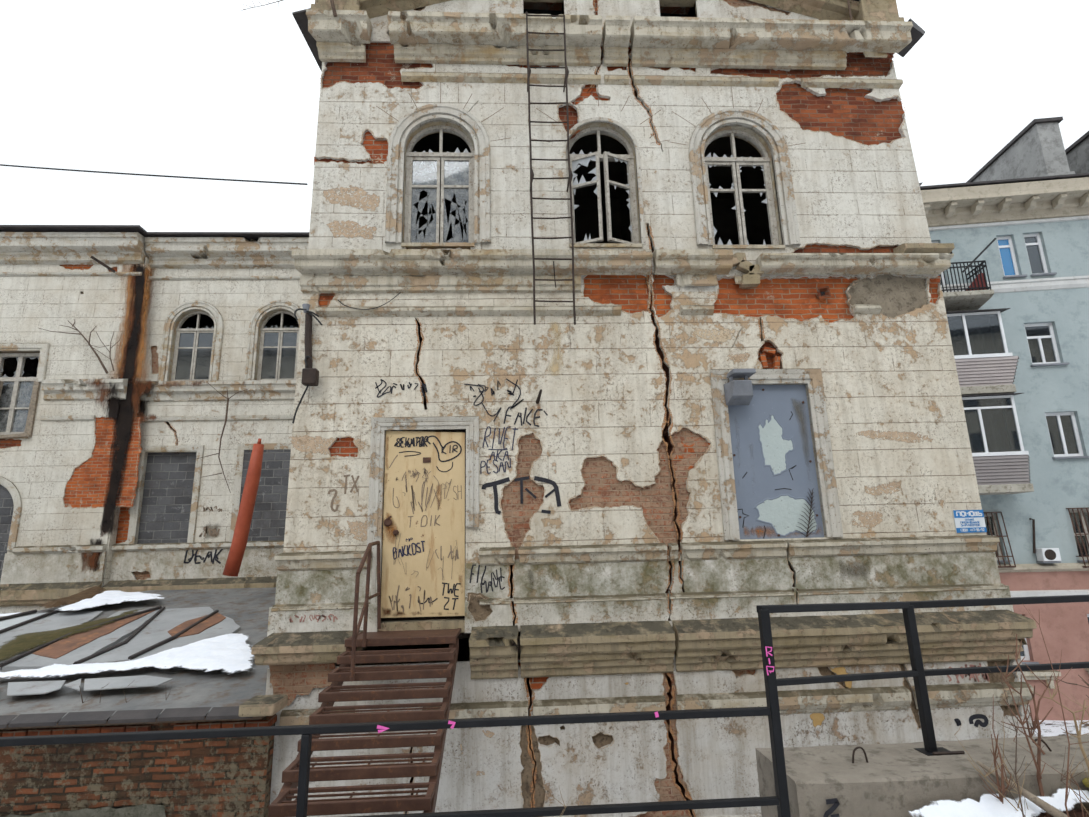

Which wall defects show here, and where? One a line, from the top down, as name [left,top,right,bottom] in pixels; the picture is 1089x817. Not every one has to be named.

spalling [320,14,434,90]
crack [588,0,660,145]
spalling [710,52,906,146]
spalling [62,416,142,544]
rust [91,264,153,407]
crack [414,318,428,410]
spalling [582,272,676,317]
spalling [567,426,711,556]
crack [646,226,684,620]
spalling [714,274,941,323]
crack [508,561,518,625]
crack [665,673,696,817]